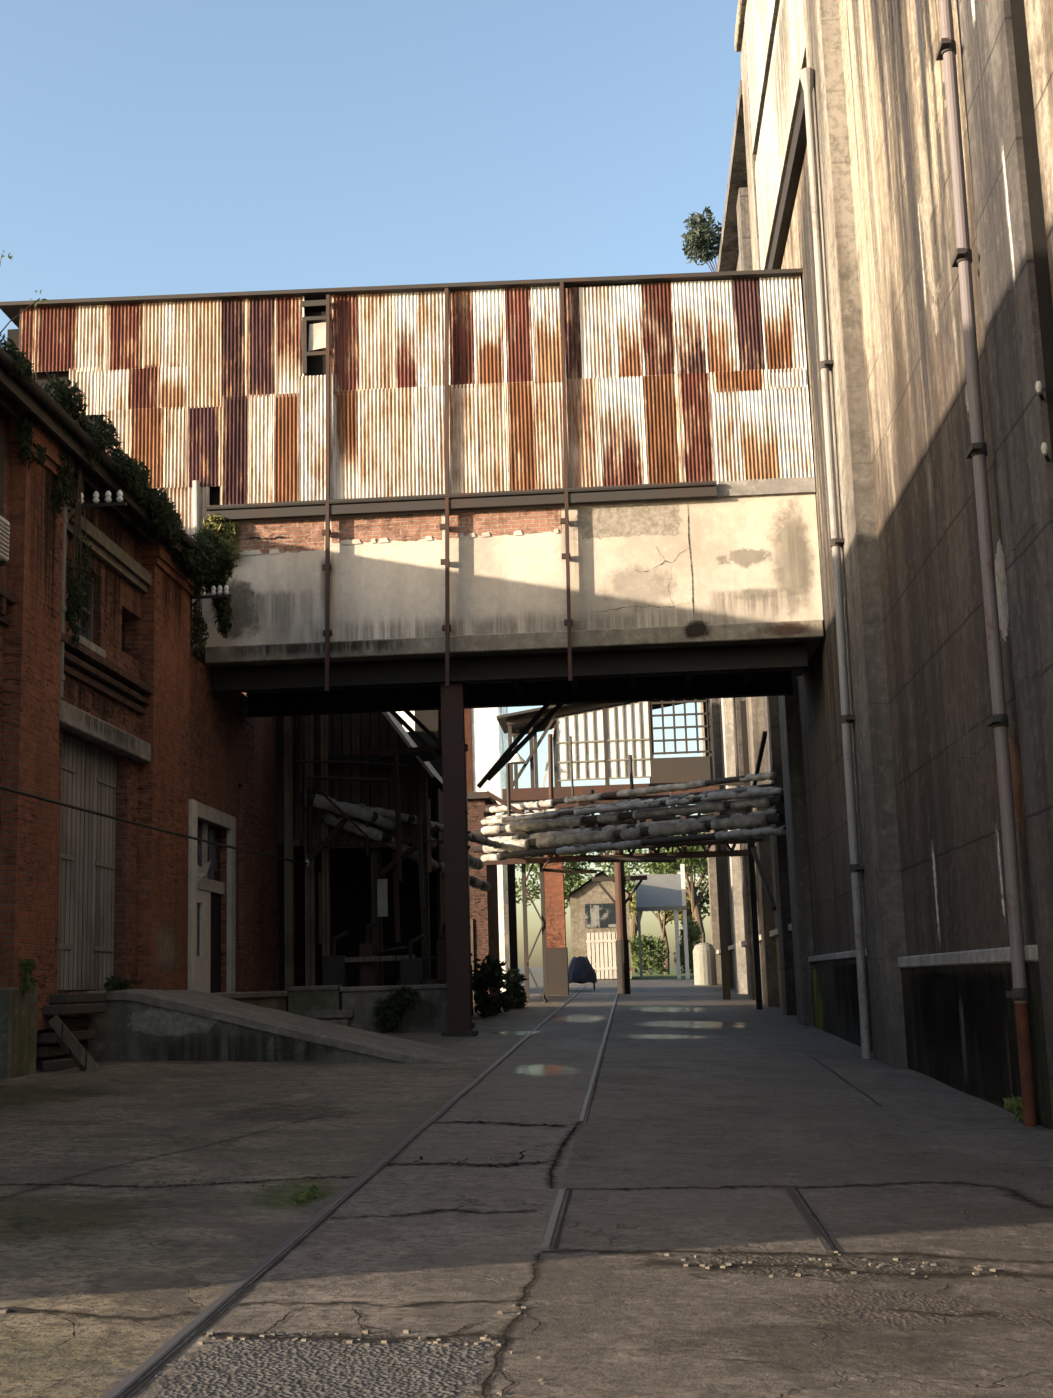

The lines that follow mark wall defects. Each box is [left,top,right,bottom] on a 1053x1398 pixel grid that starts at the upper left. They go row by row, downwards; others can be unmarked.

damp [964,0,985,162]
damp [847,0,945,406]
damp [1002,154,1015,279]
corrosion [20,278,802,505]
damp [212,581,653,655]
peeling [230,504,681,556]
damp [722,590,777,611]
crack [9,1249,1053,1398]